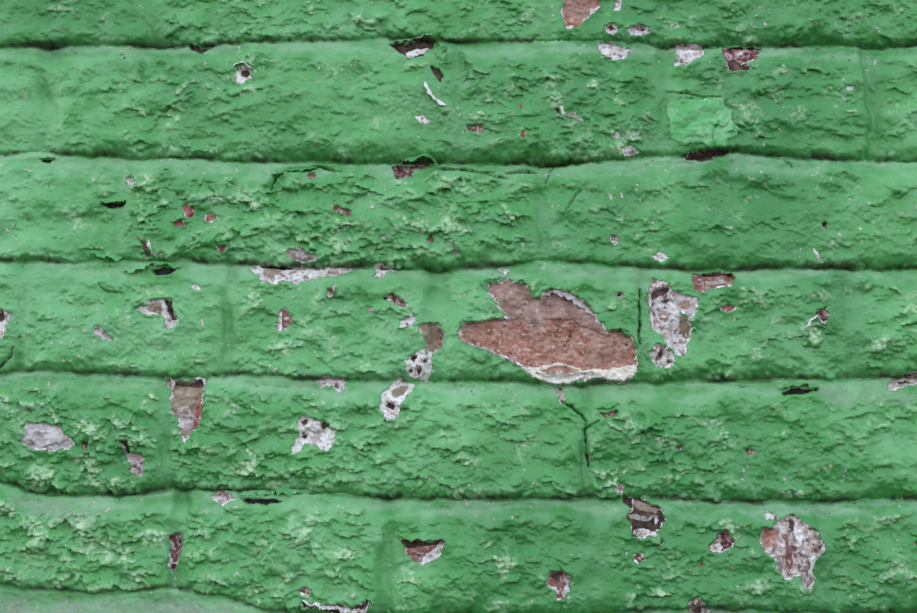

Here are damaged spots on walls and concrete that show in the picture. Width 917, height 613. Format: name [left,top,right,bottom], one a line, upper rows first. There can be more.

peeling [560,0,600,29]
peeling [597,23,651,60]
peeling [250,246,354,298]
peeling [136,298,179,330]
peeling [379,293,443,420]
peeling [457,268,735,404]
peeling [21,422,88,453]
peeling [164,376,207,444]
peeling [291,414,338,454]
peeling [614,482,666,545]
peeling [398,535,444,566]
peeling [759,510,825,593]